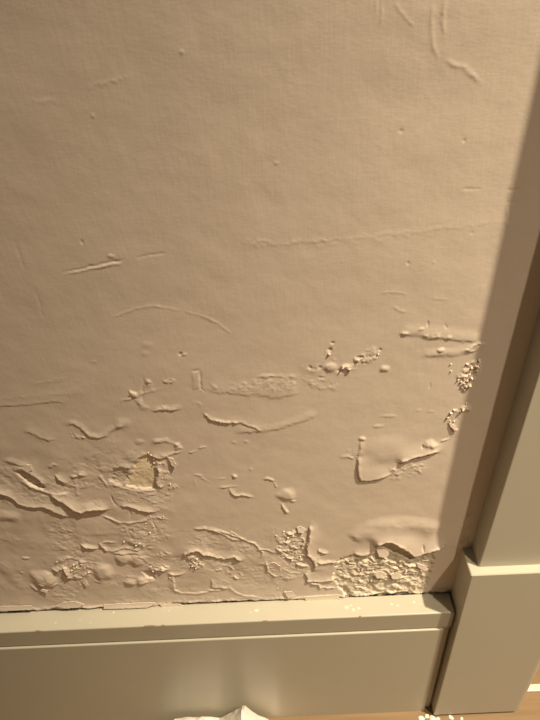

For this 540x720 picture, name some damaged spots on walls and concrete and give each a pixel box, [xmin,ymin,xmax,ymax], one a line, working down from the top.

peeling [302,341,383,391]
peeling [450,358,483,391]
peeling [446,402,472,431]
flaking render [0,449,312,596]
flaking render [333,530,445,597]